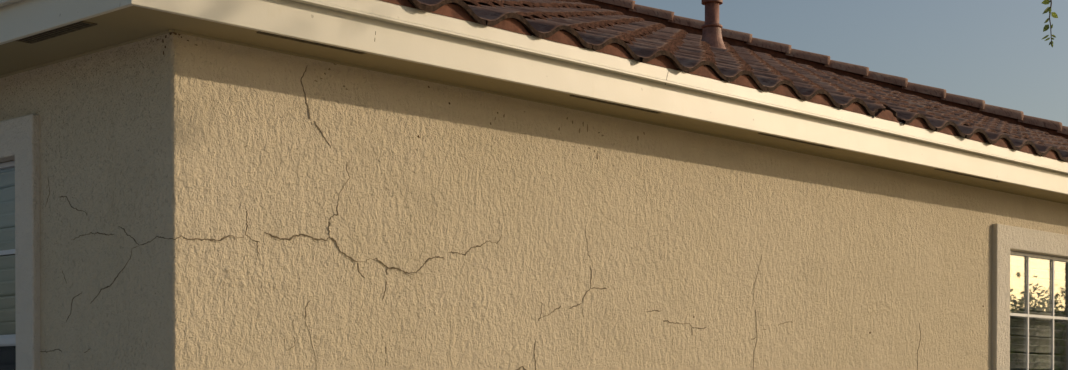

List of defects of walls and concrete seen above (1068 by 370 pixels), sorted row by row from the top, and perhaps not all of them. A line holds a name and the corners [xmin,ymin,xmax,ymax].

crack [45,67,502,321]
crack [516,230,607,370]
crack [648,310,706,345]
crack [751,255,792,368]